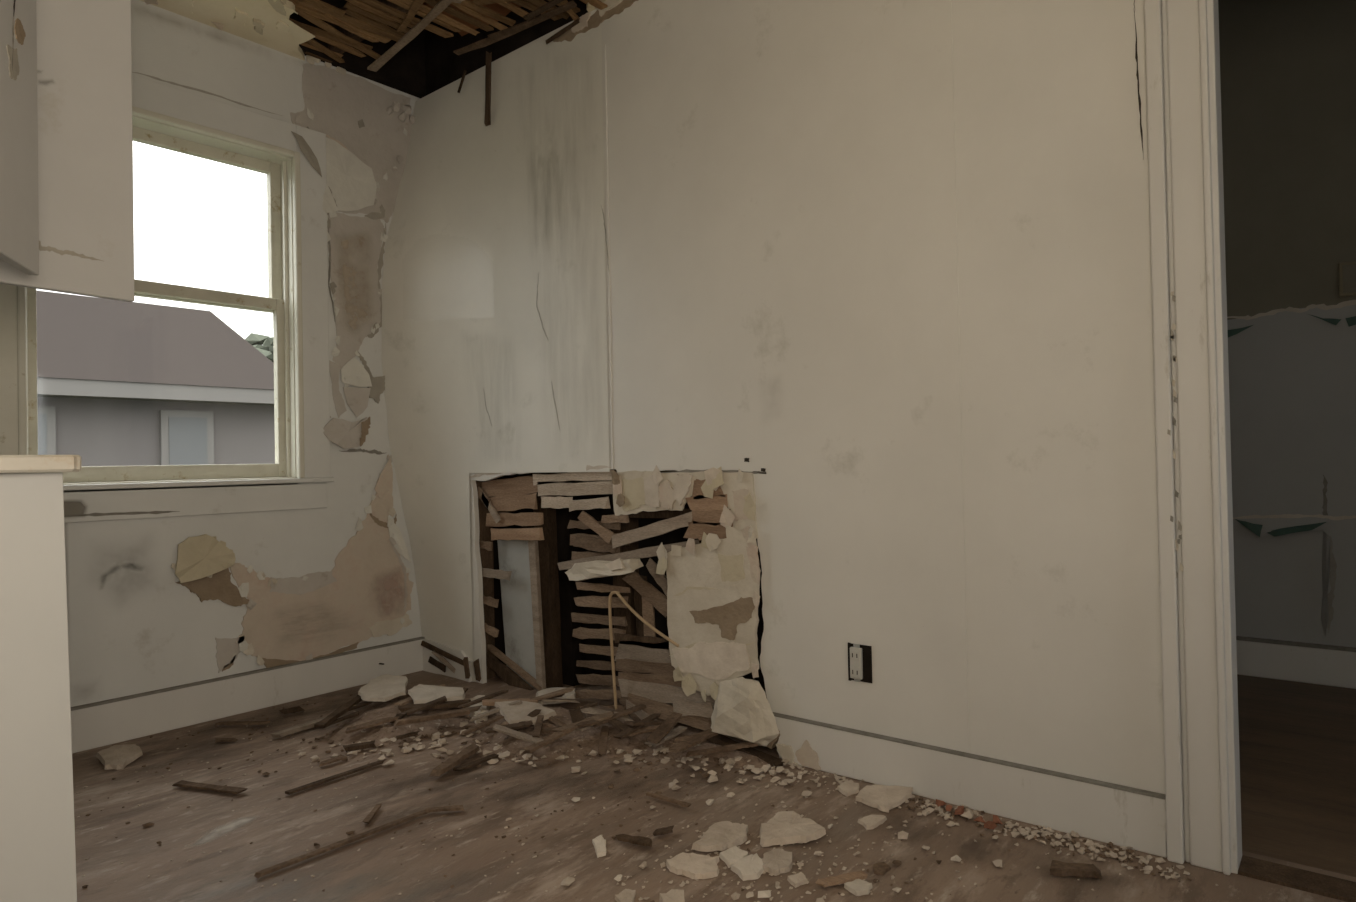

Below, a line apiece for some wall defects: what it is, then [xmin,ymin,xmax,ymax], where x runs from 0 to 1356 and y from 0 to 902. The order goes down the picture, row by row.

crack [1134,0,1143,150]
peeling [215,55,415,673]
spalling [469,465,821,771]